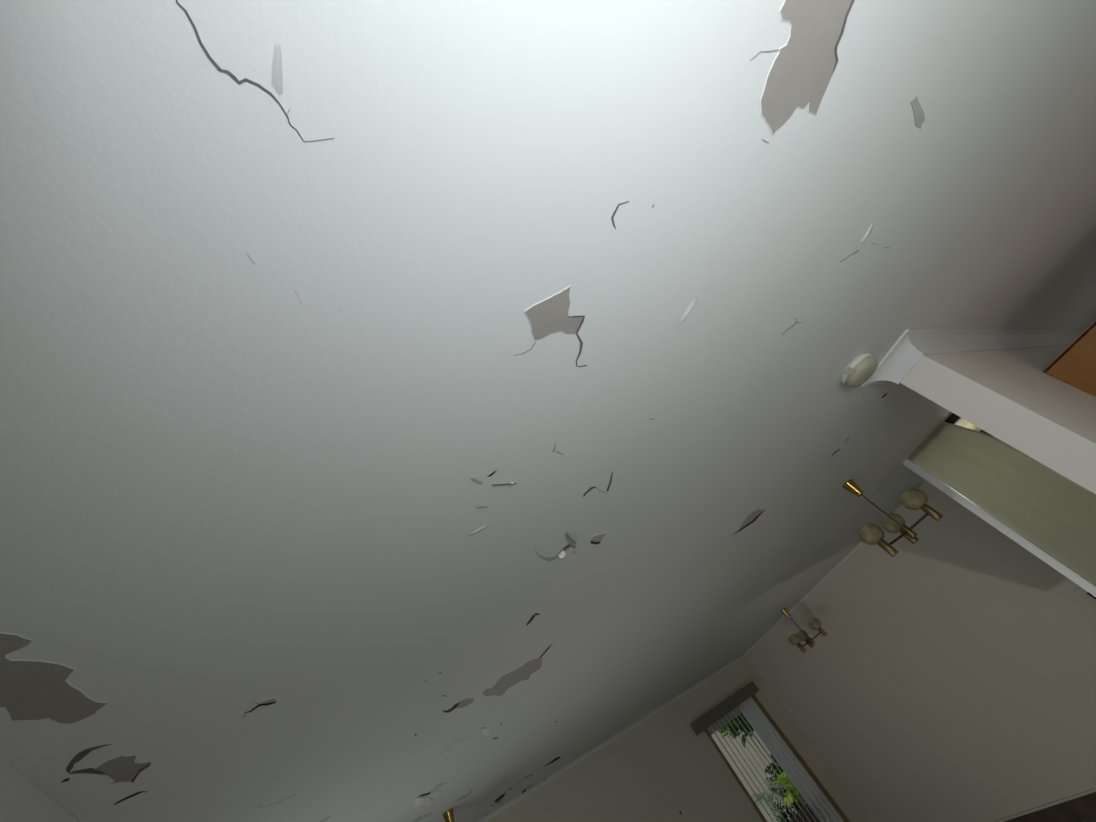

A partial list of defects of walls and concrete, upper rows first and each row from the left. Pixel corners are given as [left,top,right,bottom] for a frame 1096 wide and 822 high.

crack [176,0,333,142]
peeling [750,0,855,143]
peeling [514,285,587,367]
peeling [0,631,109,724]
peeling [442,644,552,713]
peeling [61,744,152,786]